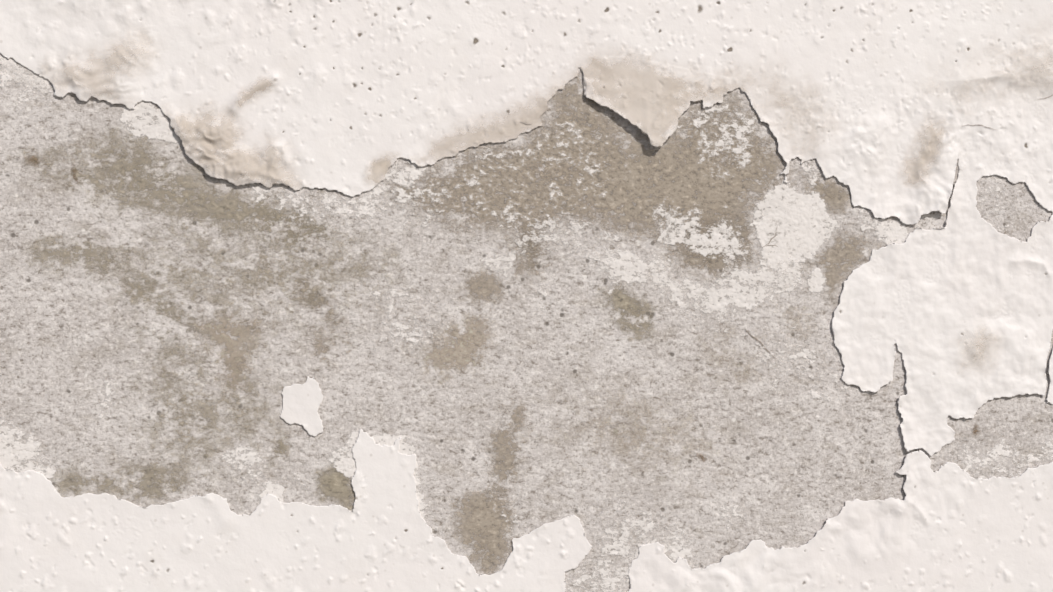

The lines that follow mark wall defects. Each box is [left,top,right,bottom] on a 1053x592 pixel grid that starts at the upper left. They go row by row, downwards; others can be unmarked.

damp [67,135,323,245]
peeling [521,153,584,200]
peeling [556,122,583,144]
damp [397,60,780,274]
peeling [580,125,608,187]
damp [806,180,849,211]
peeling [976,175,1052,242]
damp [816,237,866,291]
damp [607,285,650,339]
peeling [926,331,1053,479]
damp [318,466,355,510]
damp [454,406,525,573]